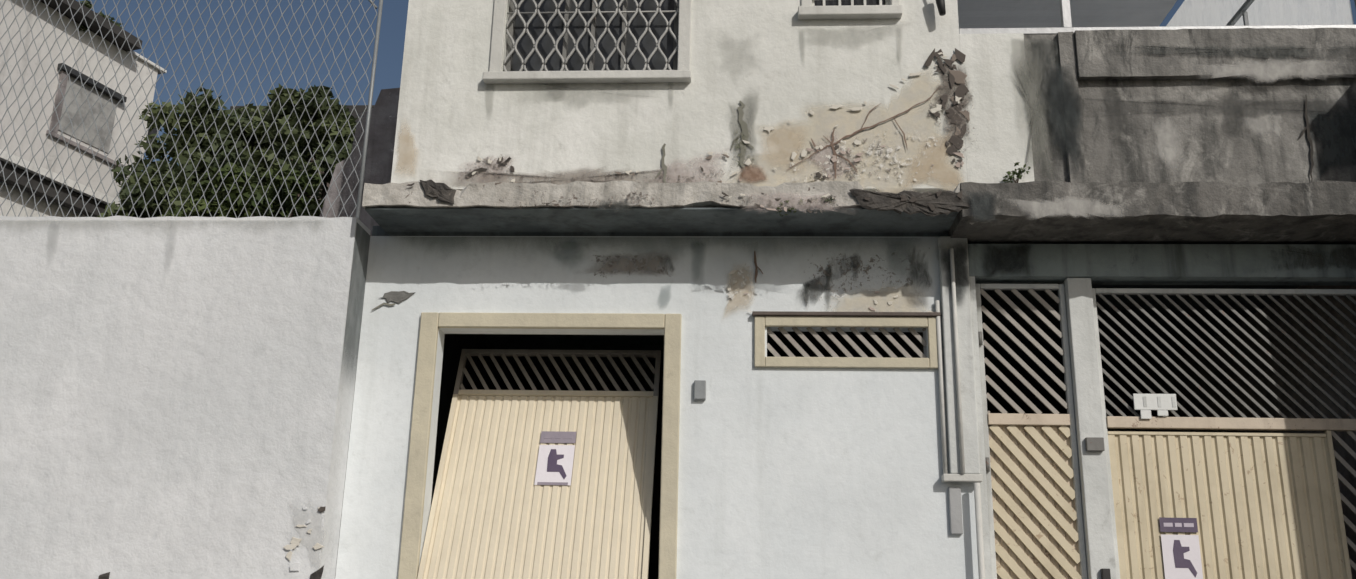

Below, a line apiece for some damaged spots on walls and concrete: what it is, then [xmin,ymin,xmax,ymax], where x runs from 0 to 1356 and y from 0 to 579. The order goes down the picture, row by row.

damp [1147,46,1324,81]
peeling [660,48,975,216]
damp [1017,39,1080,168]
damp [1152,102,1182,167]
damp [1210,99,1356,177]
crack [1299,95,1314,182]
spalling [407,156,515,204]
damp [1020,198,1117,217]
peeling [372,291,416,310]
damp [752,252,941,317]
damp [935,244,968,300]
peeling [283,506,326,579]